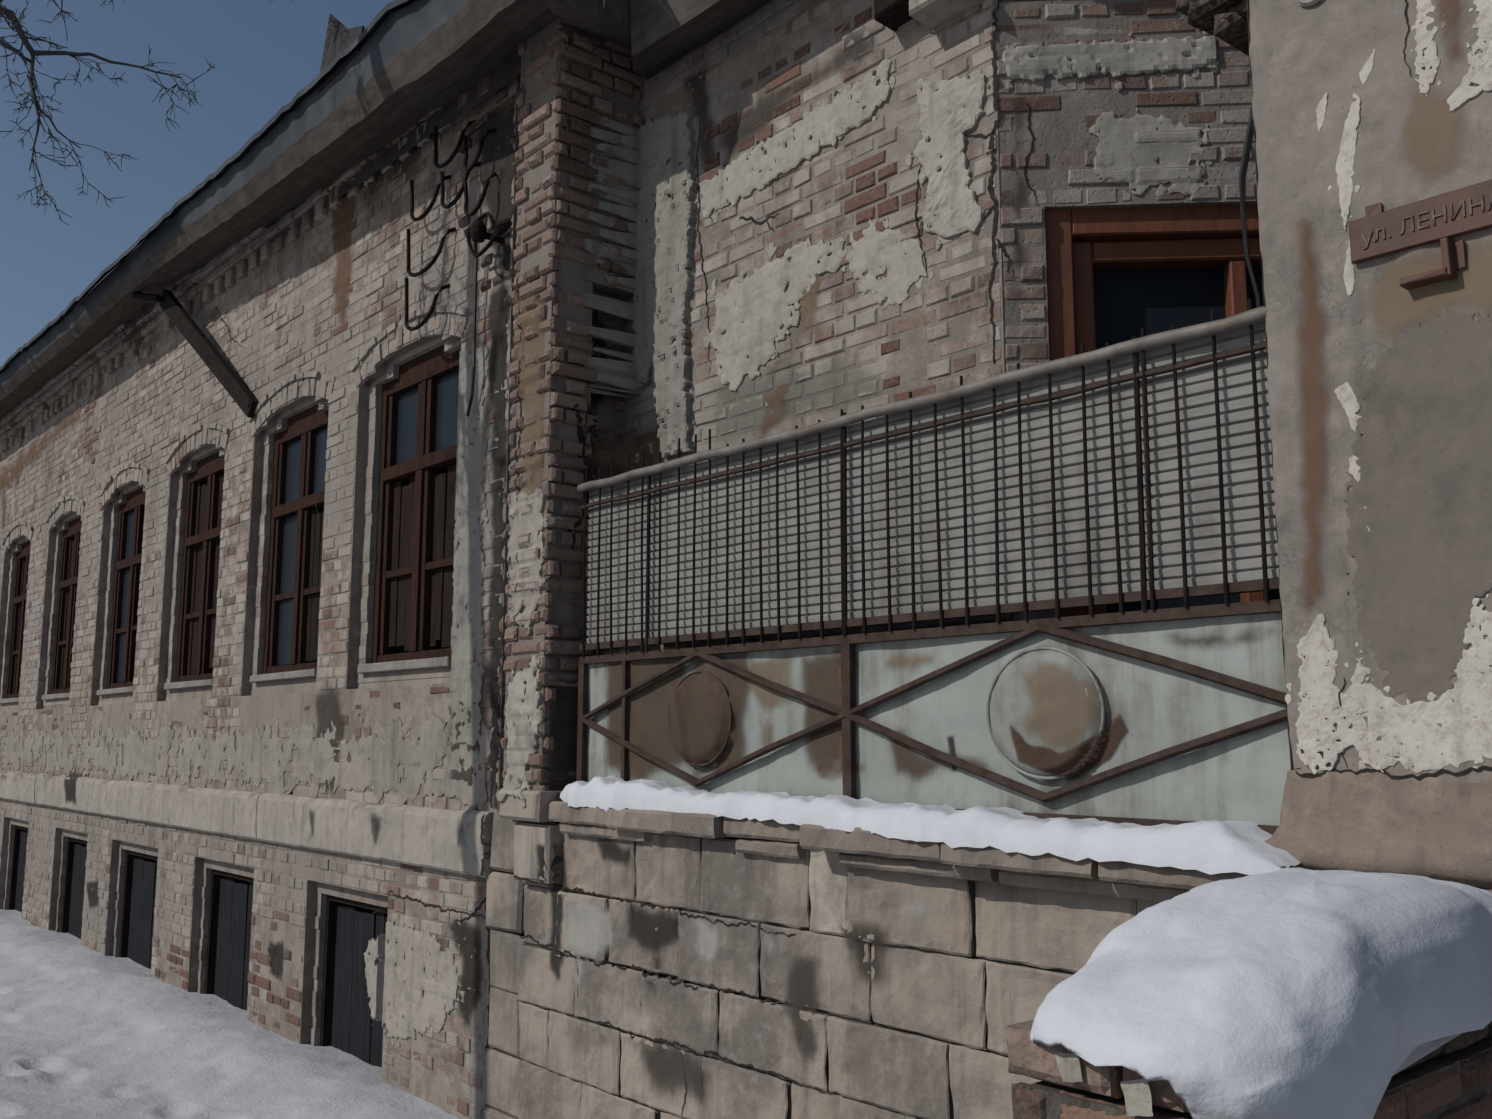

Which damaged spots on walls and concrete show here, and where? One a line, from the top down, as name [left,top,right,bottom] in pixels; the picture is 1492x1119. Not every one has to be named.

flaking render [1411,0,1492,112]
flaking render [691,31,1220,392]
crack [966,0,1039,363]
flaking render [1328,49,1375,296]
damp [606,655,749,779]
rust [1010,667,1127,780]
flaking render [1285,594,1492,775]
crack [1296,678,1492,780]
flaking render [364,918,459,1088]
damp [450,921,481,1024]
damp [537,846,612,985]
damp [629,907,679,970]